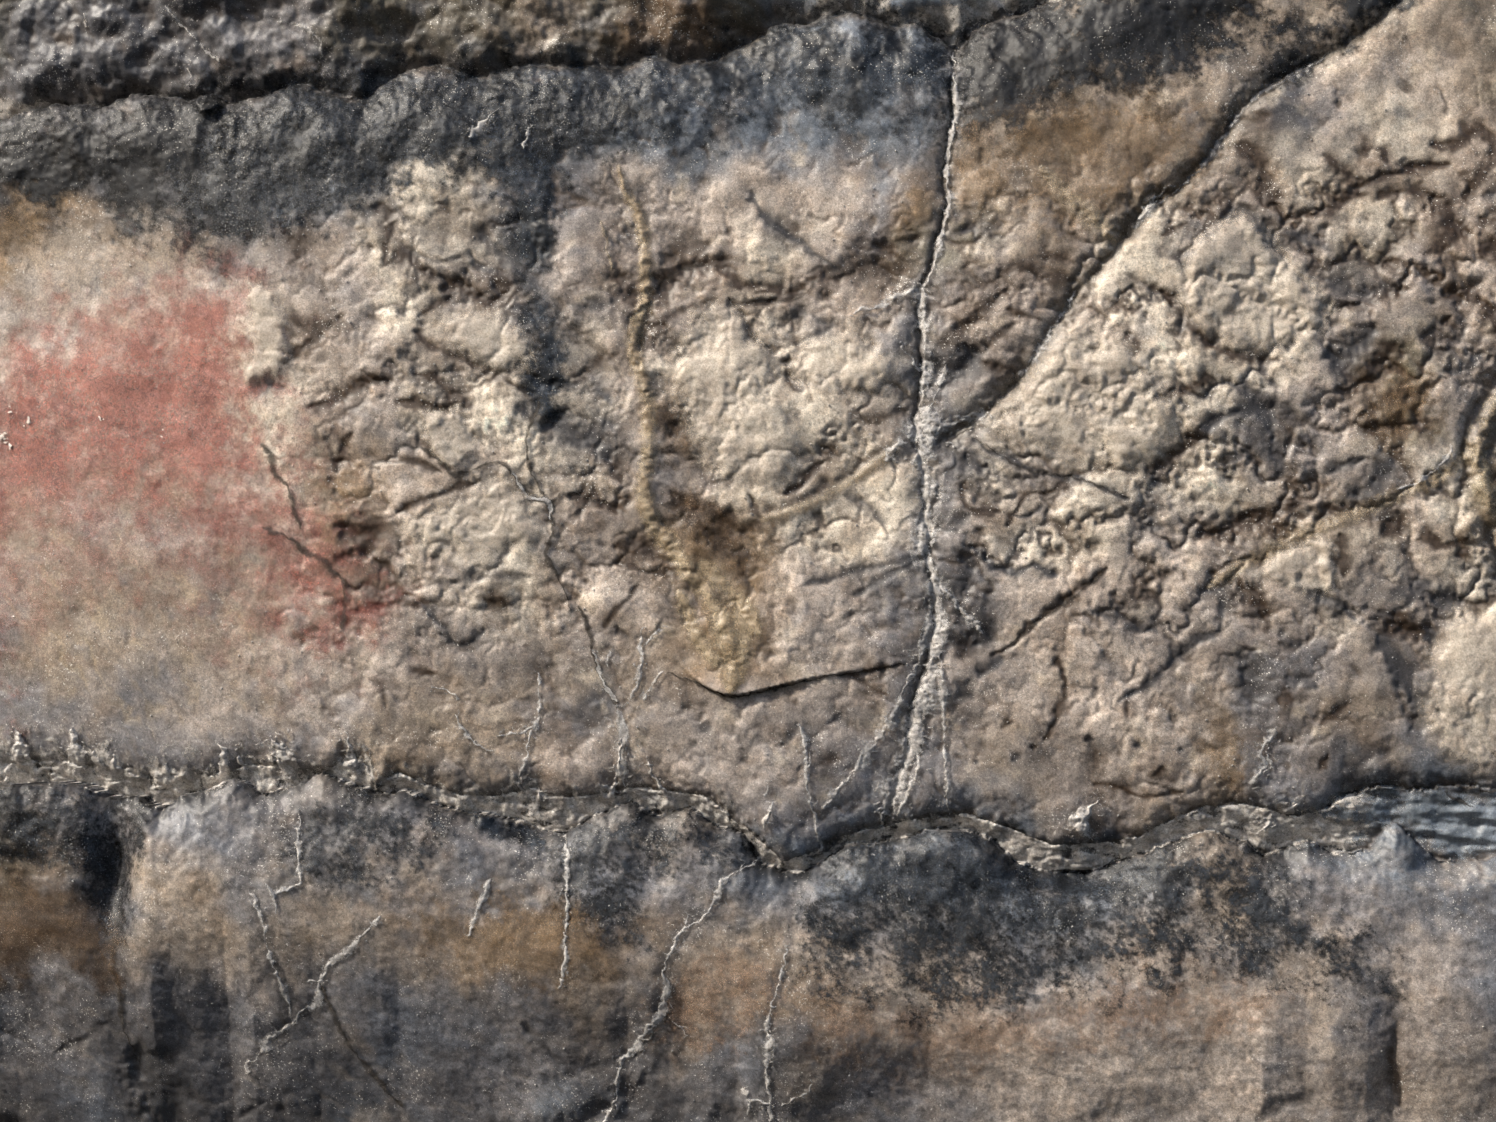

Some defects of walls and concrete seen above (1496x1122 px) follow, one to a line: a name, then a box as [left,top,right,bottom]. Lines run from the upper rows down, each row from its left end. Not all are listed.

crack [1125,21,1379,238]
crack [639,261,703,344]
crack [667,40,1128,842]
crack [1327,783,1496,809]
crack [320,984,403,1108]